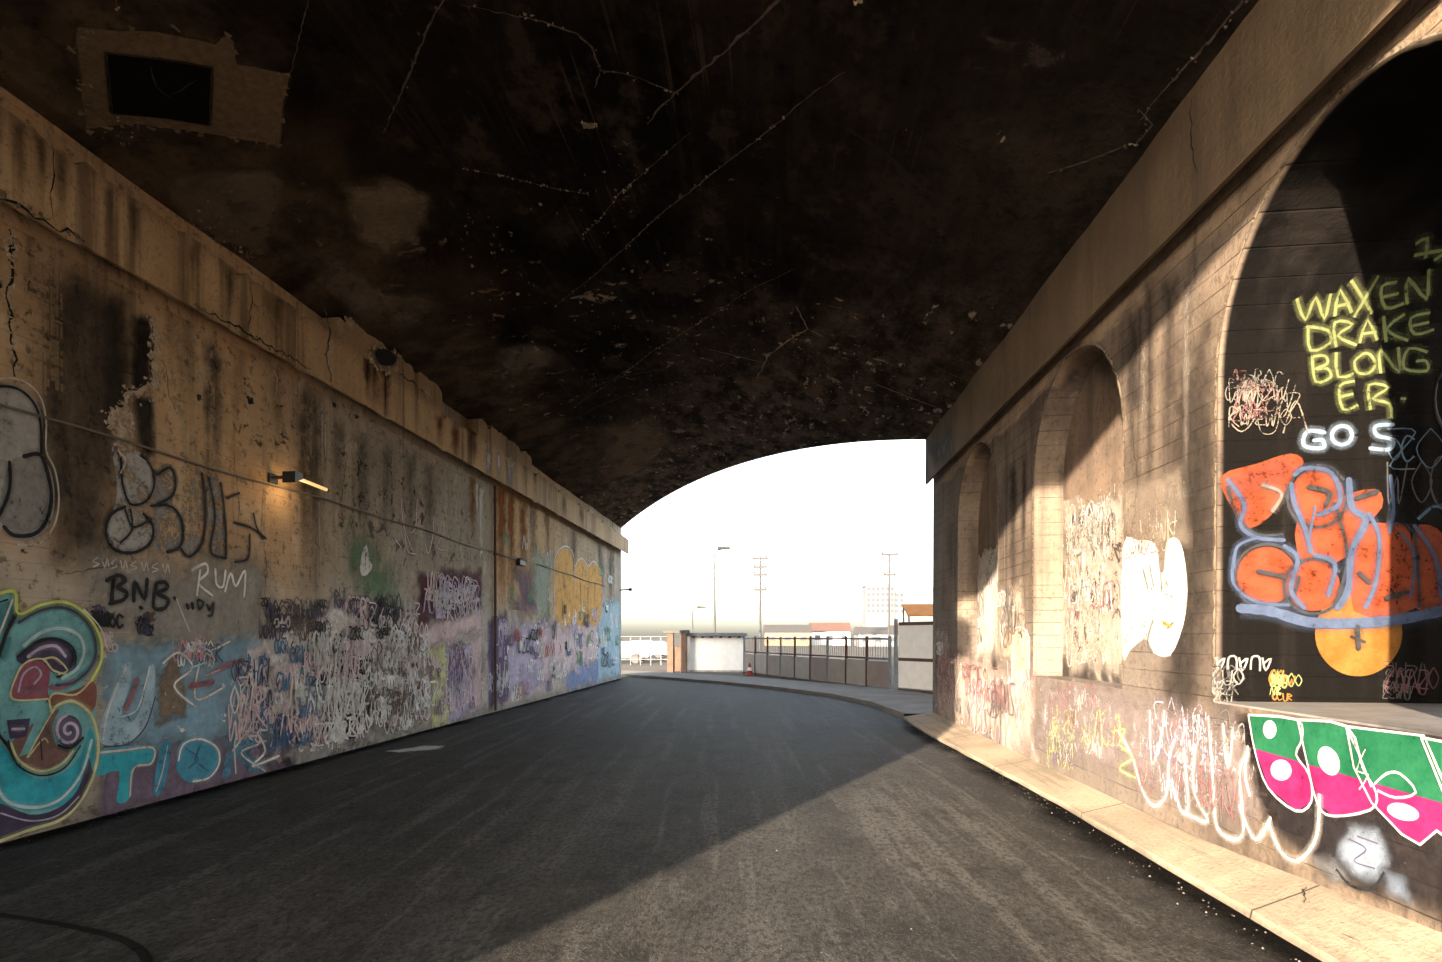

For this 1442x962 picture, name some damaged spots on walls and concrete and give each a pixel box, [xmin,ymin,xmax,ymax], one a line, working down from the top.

crack [2,224,20,377]
damp [42,276,154,556]
crack [383,0,785,235]
crack [555,71,846,307]